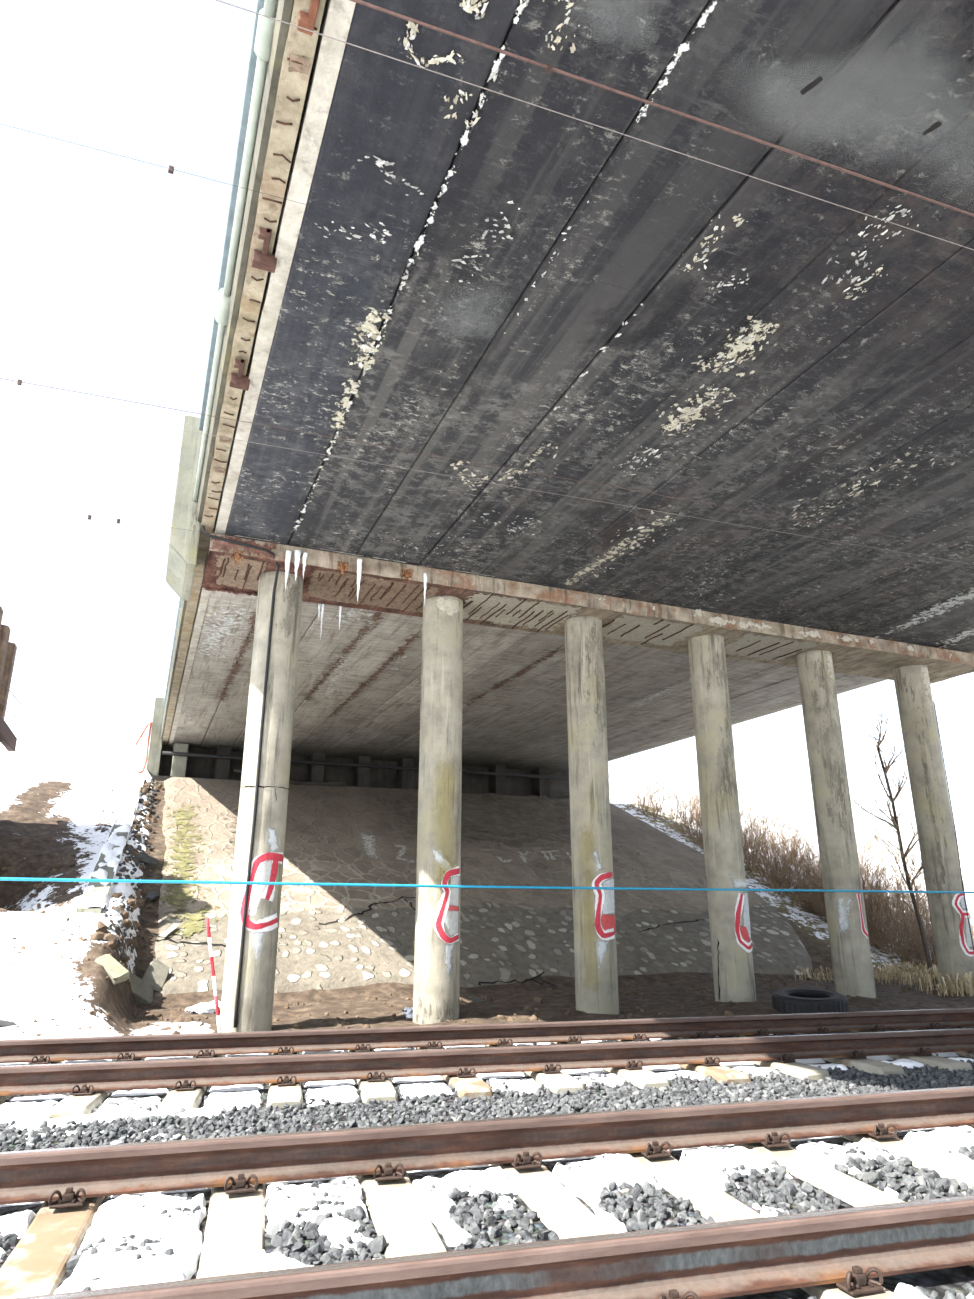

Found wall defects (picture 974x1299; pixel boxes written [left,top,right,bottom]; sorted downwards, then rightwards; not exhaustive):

water stain [514,0,529,25]
water stain [636,2,717,122]
peeling [330,307,391,428]
peeling [656,316,779,437]
peeling [613,446,662,475]
rust [209,535,277,563]
water stain [873,588,974,638]
water stain [936,629,974,648]
crack [319,896,416,924]